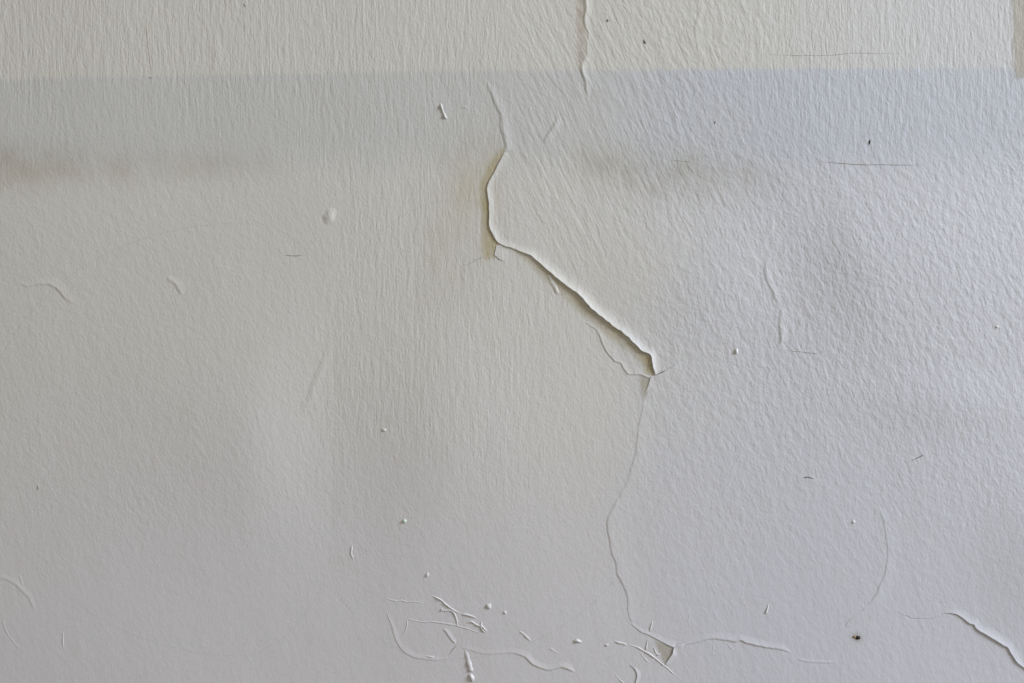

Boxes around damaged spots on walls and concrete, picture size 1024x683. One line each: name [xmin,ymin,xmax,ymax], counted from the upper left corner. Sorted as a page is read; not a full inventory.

crack [467,81,836,666]
crack [900,607,1024,668]